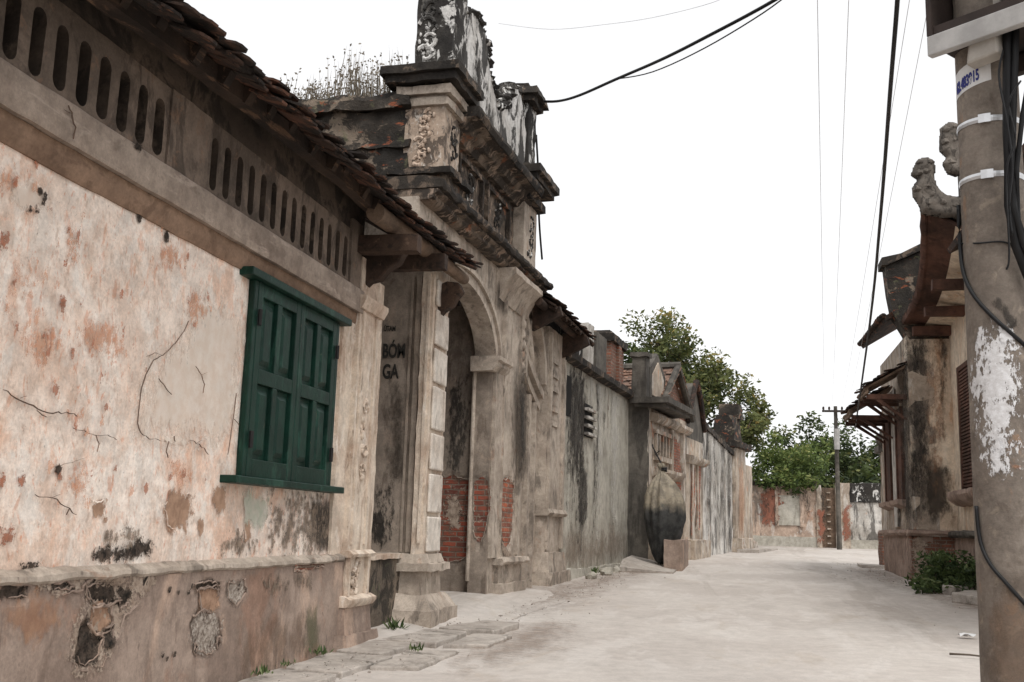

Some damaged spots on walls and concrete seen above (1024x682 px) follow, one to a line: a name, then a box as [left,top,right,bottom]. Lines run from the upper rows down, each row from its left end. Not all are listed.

crack [35,494,77,515]
crack [4,321,239,470]
flaking render [0,460,248,682]
peeling [221,488,330,597]
damp [312,501,330,552]
flaking render [438,474,514,563]
damp [566,365,606,542]
damp [900,332,950,526]